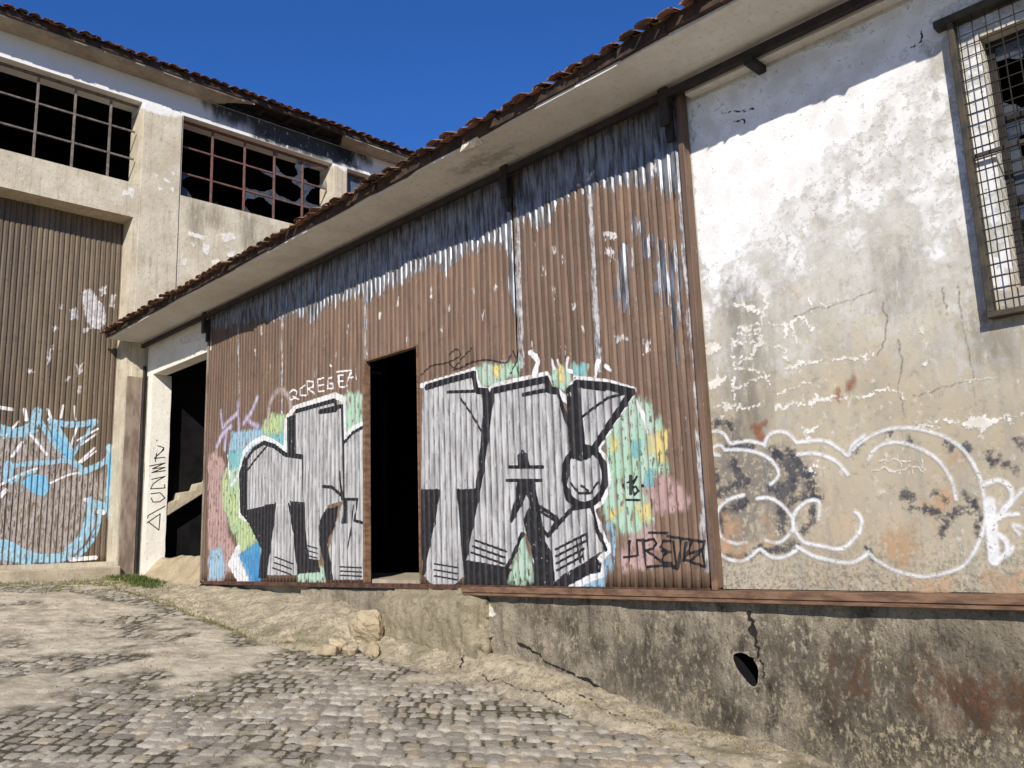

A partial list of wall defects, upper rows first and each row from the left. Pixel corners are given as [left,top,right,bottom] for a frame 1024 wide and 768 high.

peeling [180,0,1012,573]
crack [714,291,906,478]
crack [459,642,666,730]
crack [747,611,765,678]